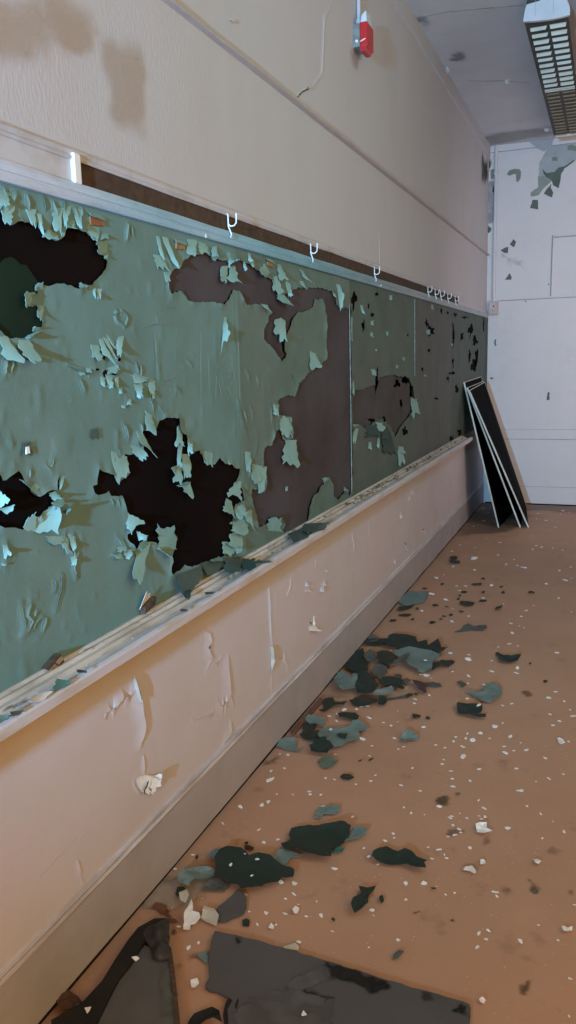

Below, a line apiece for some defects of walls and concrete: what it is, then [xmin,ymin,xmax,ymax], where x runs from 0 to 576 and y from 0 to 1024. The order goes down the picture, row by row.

crack [296,0,333,97]
peeling [529,128,576,209]
peeling [0,188,109,364]
peeling [79,334,156,409]
peeling [424,305,484,371]
peeling [93,236,420,612]
peeling [0,472,78,566]